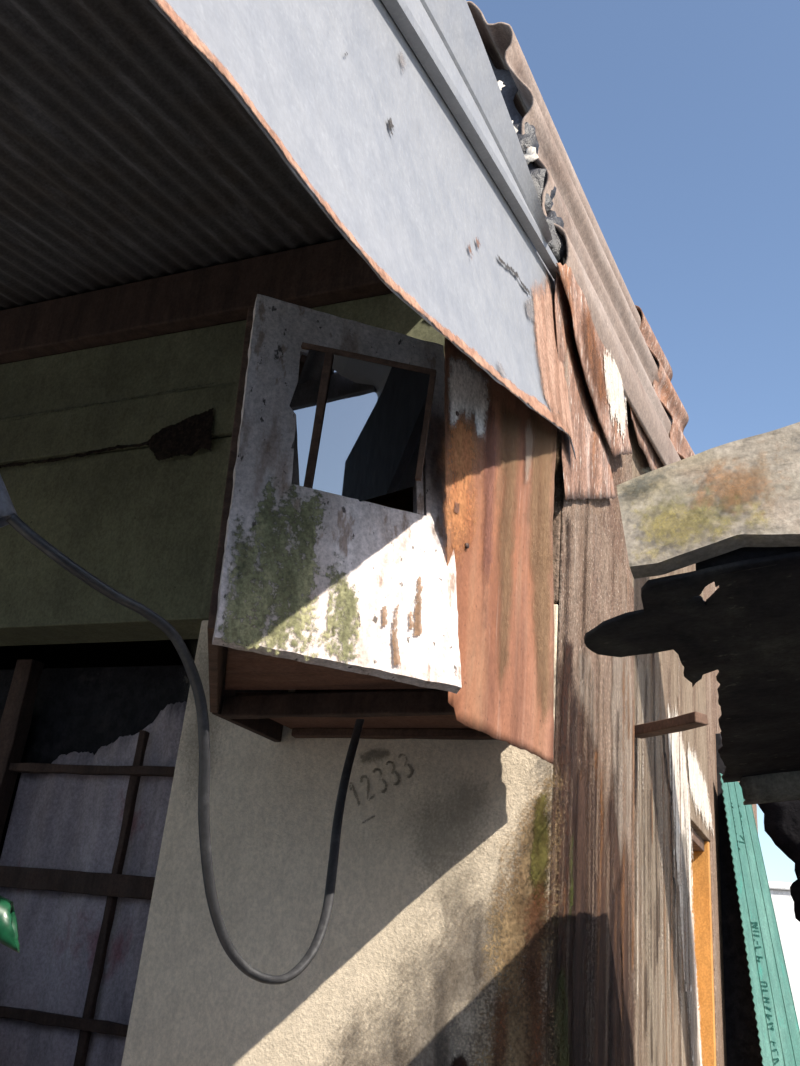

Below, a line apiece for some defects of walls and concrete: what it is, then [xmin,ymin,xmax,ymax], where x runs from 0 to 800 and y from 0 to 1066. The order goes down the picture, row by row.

crack [0,441,149,468]
flaking render [147,408,214,461]
rust [582,309,607,409]
water stain [325,874,511,1066]
rust [470,765,563,1066]
peeling [668,731,714,1066]